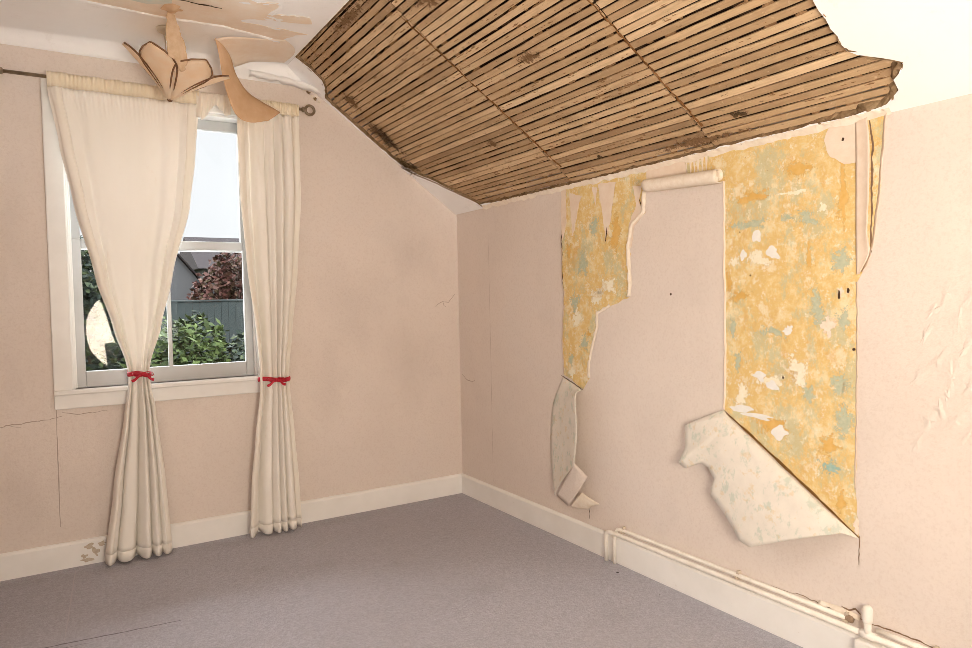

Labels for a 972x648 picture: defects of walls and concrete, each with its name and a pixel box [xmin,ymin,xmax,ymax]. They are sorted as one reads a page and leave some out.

spalling [73,0,903,562]